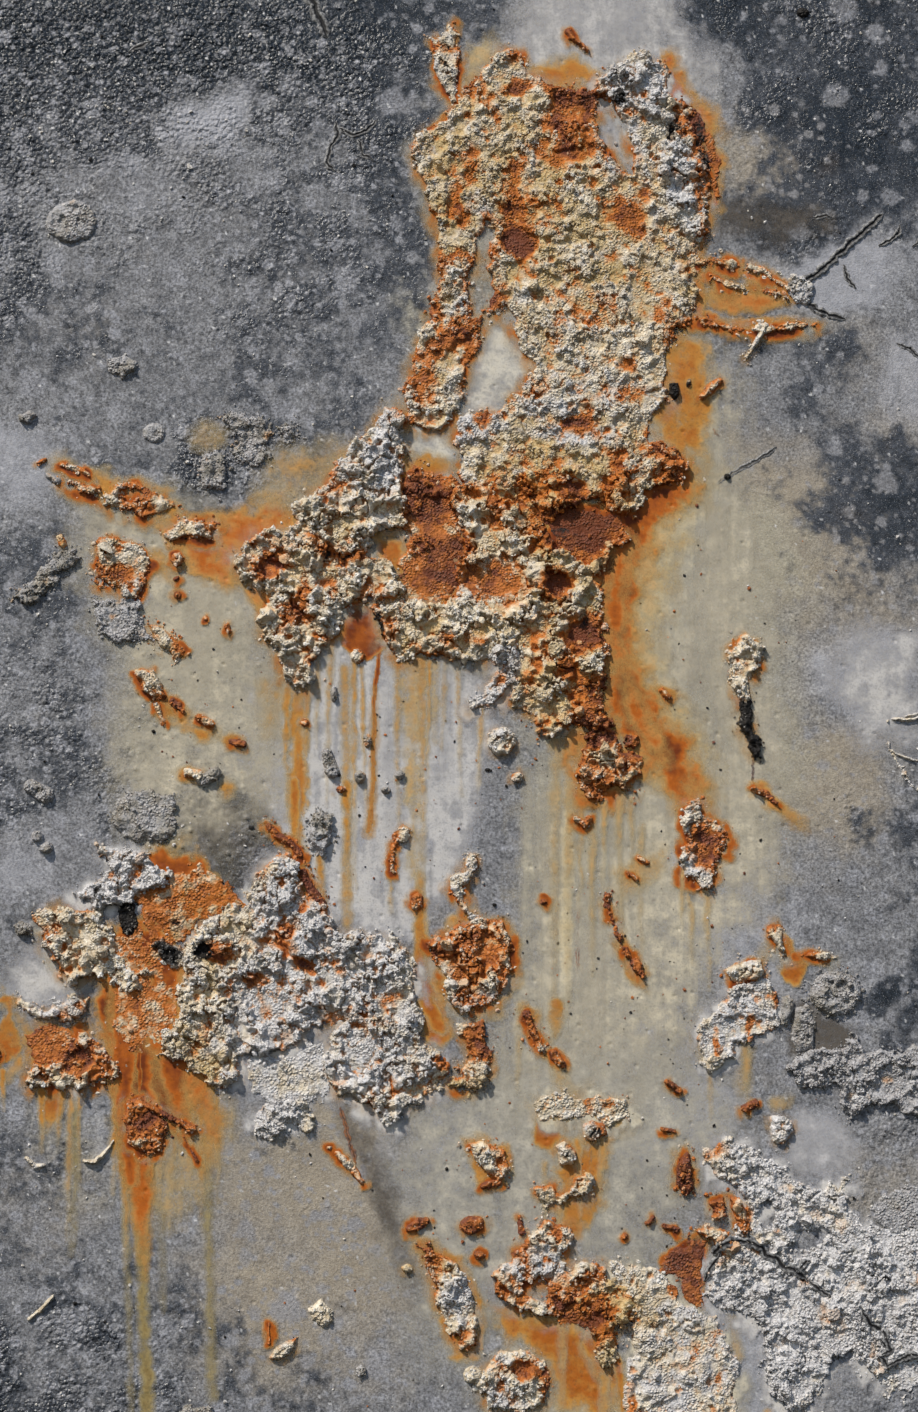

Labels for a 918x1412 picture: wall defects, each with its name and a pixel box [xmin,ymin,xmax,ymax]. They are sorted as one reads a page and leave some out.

damp [190,403,307,501]
corrosion [90,449,344,610]
corrosion [572,253,821,811]
damp [836,631,918,751]
corrosion [147,840,209,876]
damp [801,966,865,1021]
corrosion [94,918,233,1412]
damp [689,1220,733,1249]
damp [413,1239,491,1351]
corrosion [401,1216,627,1412]
crack [703,1231,918,1374]
damp [463,1347,587,1412]